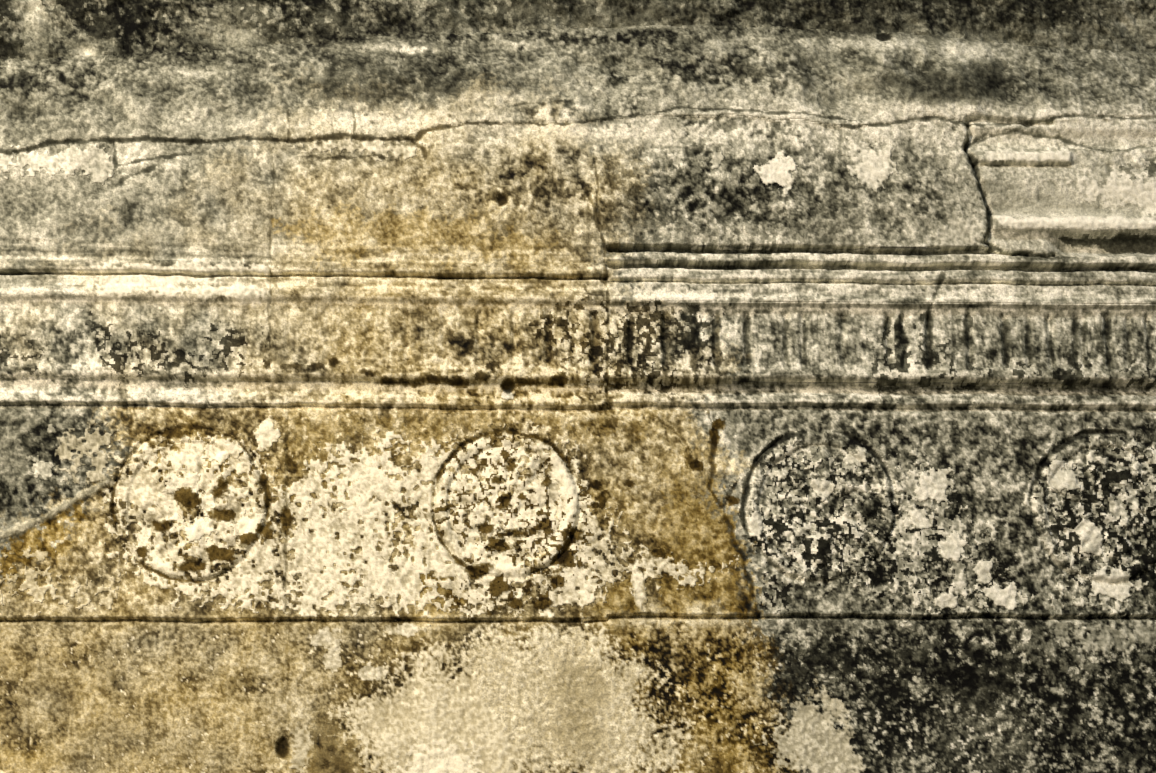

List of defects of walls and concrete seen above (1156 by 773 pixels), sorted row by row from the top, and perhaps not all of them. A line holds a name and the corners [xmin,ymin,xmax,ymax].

water stain [0,332,94,546]
crack [126,408,134,459]
water stain [134,422,294,585]
water stain [359,359,502,388]
water stain [427,423,612,625]
crack [571,425,584,470]
crack [0,99,1156,439]
water stain [742,313,753,366]
water stain [644,418,1156,773]
water stain [866,310,1156,408]
water stain [0,630,191,773]
water stain [288,622,551,773]